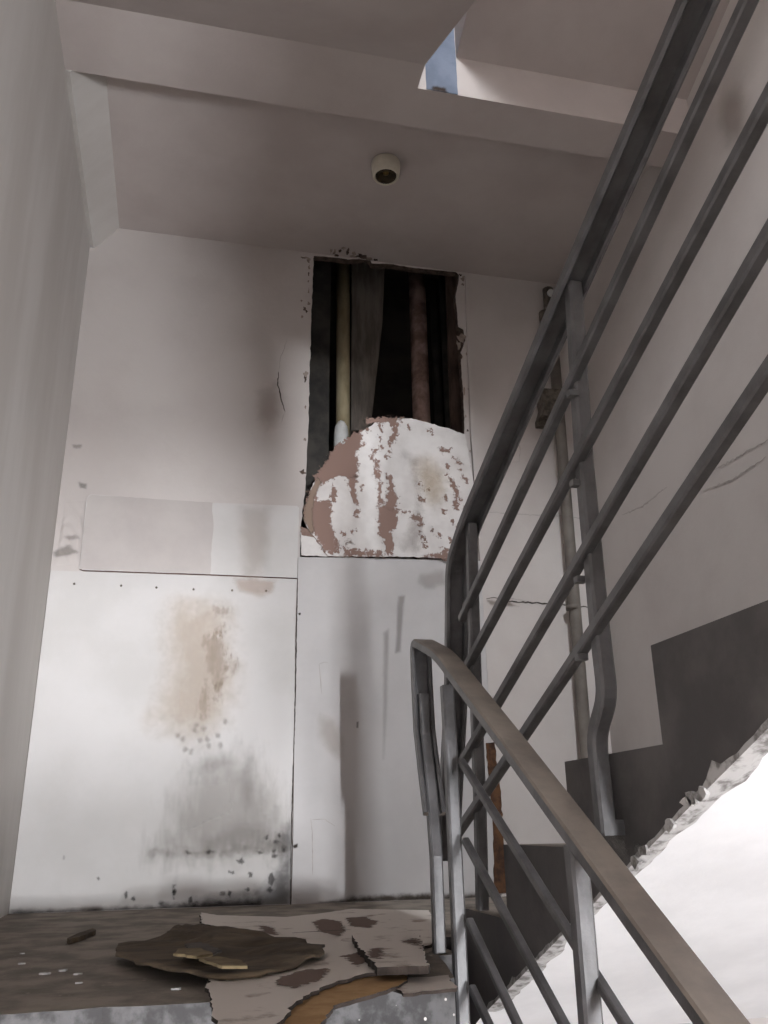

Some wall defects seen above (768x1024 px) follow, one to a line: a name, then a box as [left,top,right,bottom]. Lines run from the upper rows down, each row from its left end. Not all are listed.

peeling [299,415,471,561]
crack [703,439,768,491]
spalling [627,719,768,876]
water stain [147,889,260,909]
spalling [593,892,607,915]
spalling [487,923,571,1012]